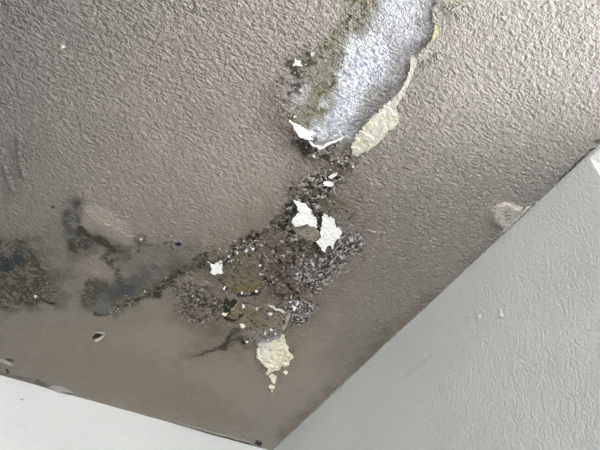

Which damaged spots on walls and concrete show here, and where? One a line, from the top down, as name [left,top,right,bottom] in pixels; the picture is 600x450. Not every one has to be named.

crack [190,327,251,358]
damp [0,79,508,448]
peeling [168,0,448,354]
damp [277,14,456,367]
damp [510,145,594,224]